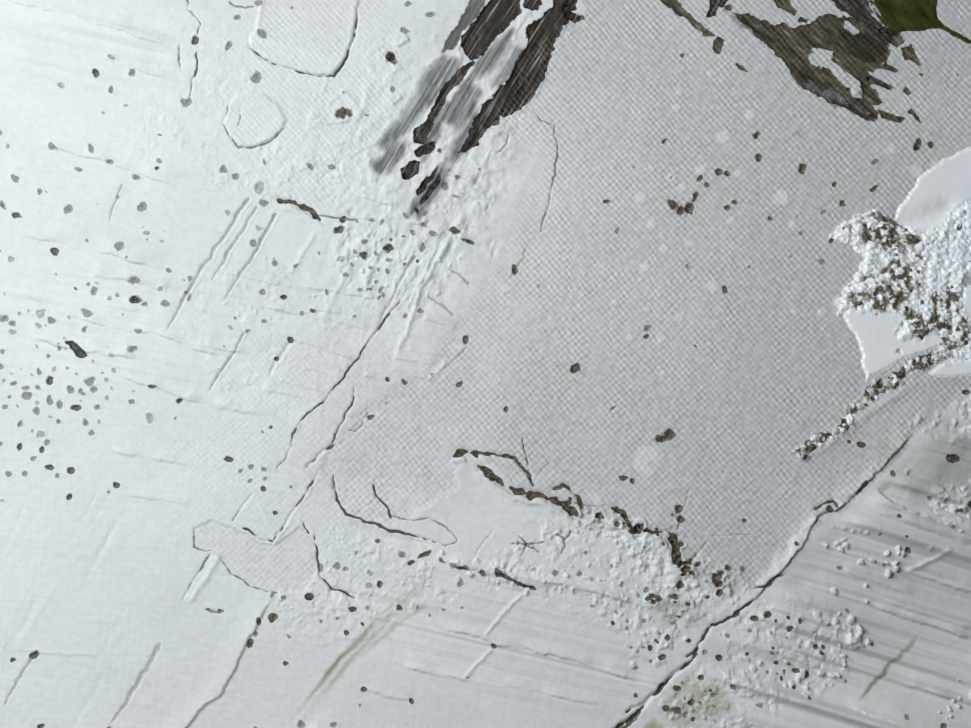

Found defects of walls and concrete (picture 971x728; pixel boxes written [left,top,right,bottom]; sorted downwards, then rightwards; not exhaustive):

peeling [661,0,923,123]
peeling [334,0,585,299]
spalling [913,138,934,151]
spalling [668,168,730,215]
spalling [792,146,971,460]
spalling [224,456,267,492]
crack [233,313,536,598]
spalling [656,429,676,442]
crack [814,447,902,522]
spalling [399,550,508,587]
crack [453,437,794,728]
spalling [644,581,684,602]